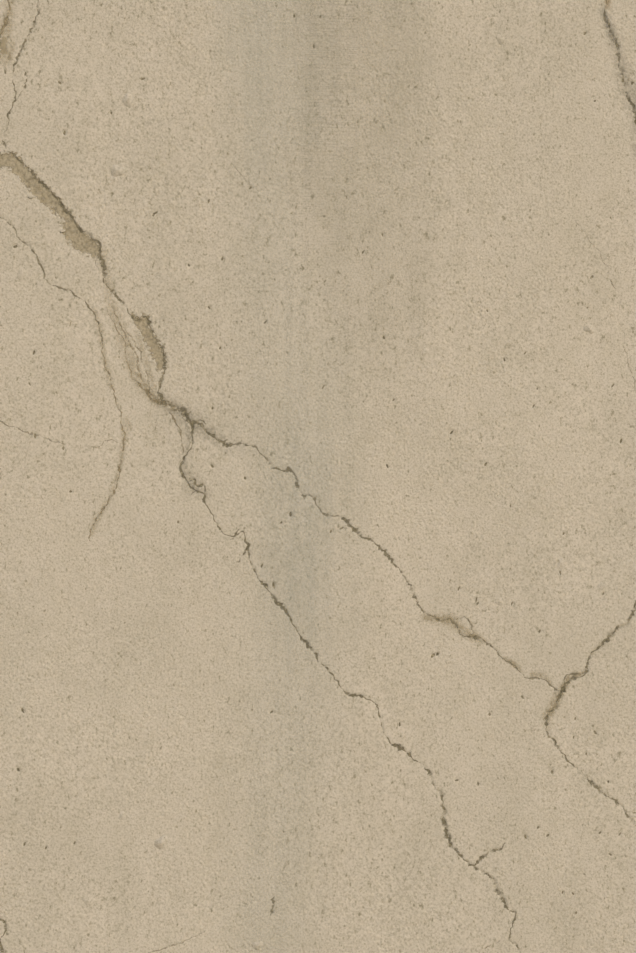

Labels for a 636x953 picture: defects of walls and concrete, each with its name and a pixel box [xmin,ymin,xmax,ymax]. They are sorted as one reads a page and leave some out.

crack [0,0,11,44]
crack [7,0,40,123]
crack [604,10,636,124]
crack [3,141,636,766]
crack [387,737,518,948]
crack [588,780,629,818]